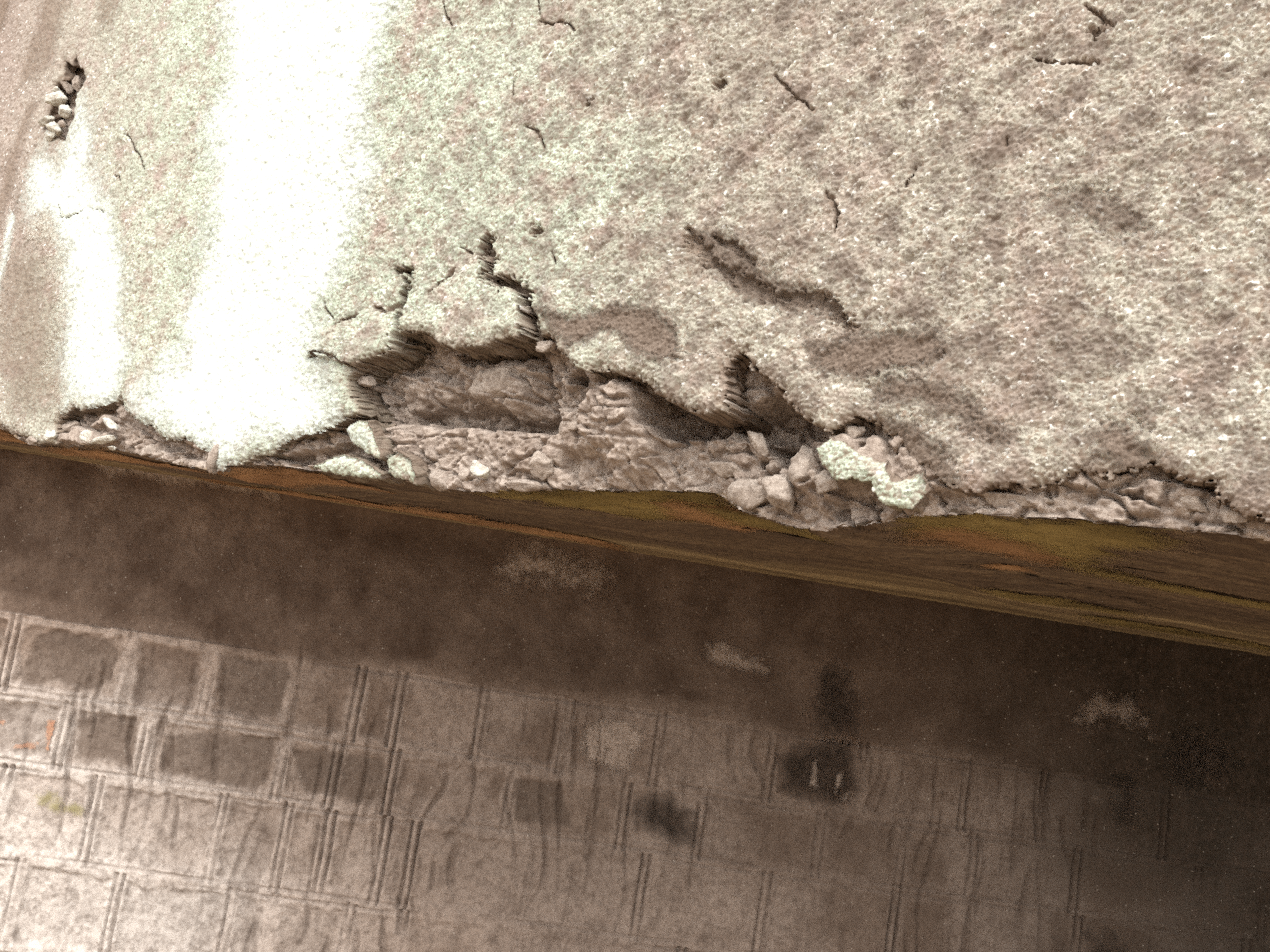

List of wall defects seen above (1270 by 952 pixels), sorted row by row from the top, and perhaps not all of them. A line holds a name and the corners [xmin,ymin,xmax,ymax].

spalling [38,68,86,142]
crack [309,350,359,370]
crack [324,301,408,350]
crack [410,246,543,341]
peeling [696,231,841,321]
crack [694,236,848,324]
spalling [0,255,1270,541]
leakage [488,489,824,541]
leakage [904,513,1270,611]
leakage [784,746,852,796]
leakage [639,801,686,837]